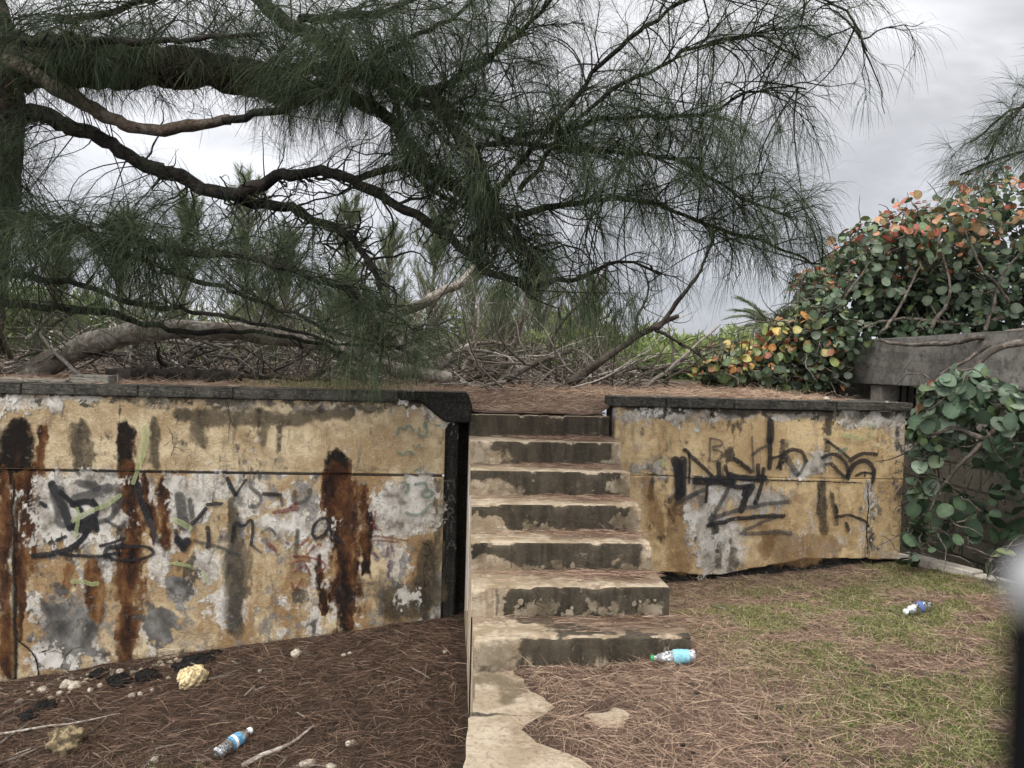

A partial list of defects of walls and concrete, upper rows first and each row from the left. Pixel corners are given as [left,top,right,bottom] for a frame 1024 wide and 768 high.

corrosion [0,417,49,680]
damp [69,419,96,475]
corrosion [61,420,173,662]
damp [224,497,252,637]
damp [173,405,355,448]
corrosion [314,448,374,633]
peeling [683,444,830,580]
damp [817,482,839,535]